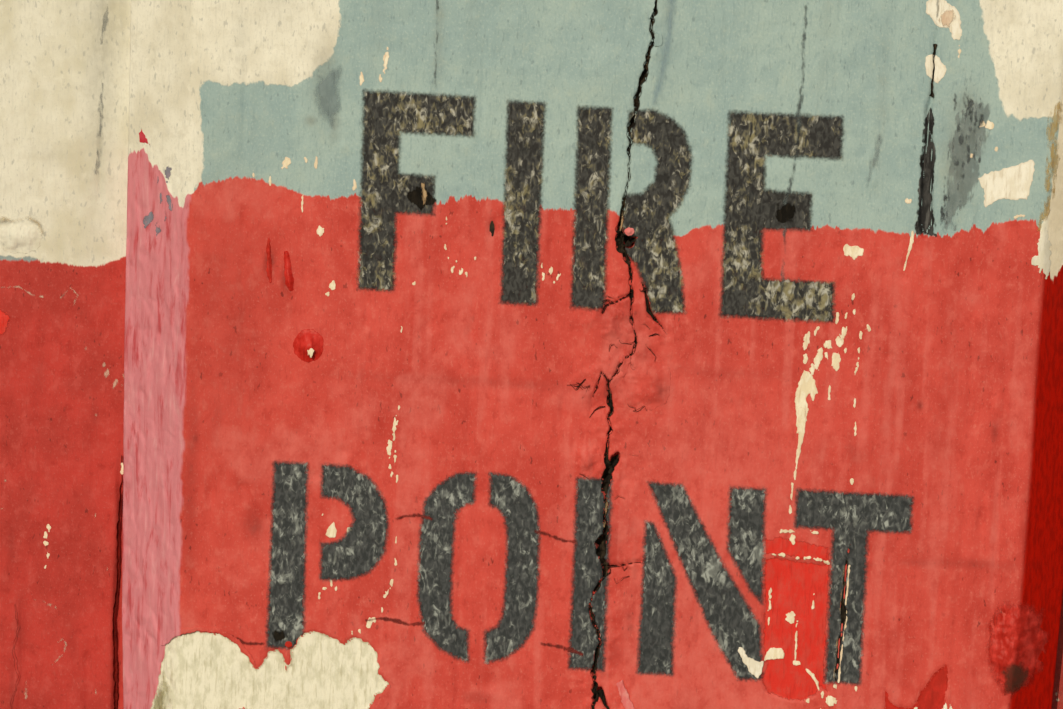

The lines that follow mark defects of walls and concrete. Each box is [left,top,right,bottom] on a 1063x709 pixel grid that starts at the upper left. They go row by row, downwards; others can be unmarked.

peeling [386,406,400,483]
crack [535,0,666,709]
peeling [789,293,871,514]
peeling [151,579,393,709]
peeling [738,529,837,709]
peeling [884,664,952,709]